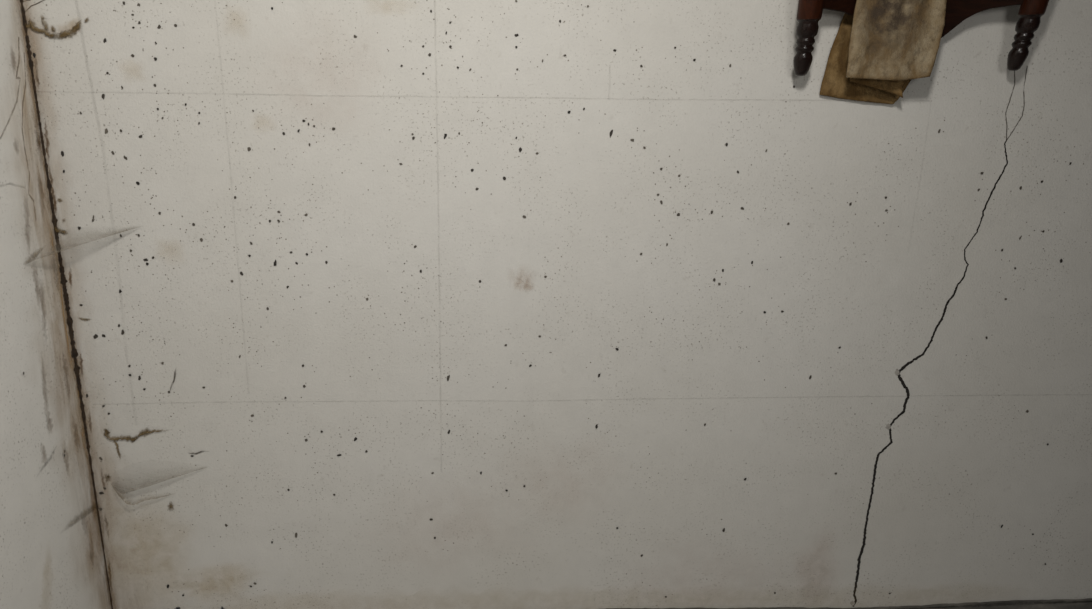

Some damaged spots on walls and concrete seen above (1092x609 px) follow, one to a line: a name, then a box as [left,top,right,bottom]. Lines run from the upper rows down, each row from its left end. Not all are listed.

crack [16,0,113,609]
crack [850,66,1028,607]
crack [902,601,981,609]
crack [1037,598,1092,606]